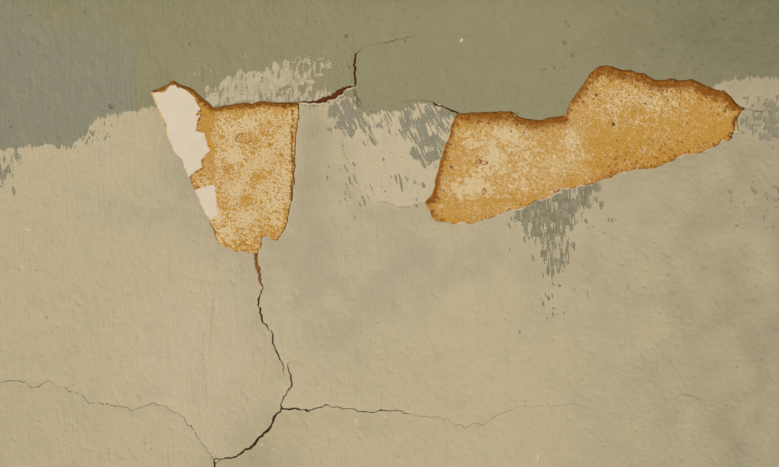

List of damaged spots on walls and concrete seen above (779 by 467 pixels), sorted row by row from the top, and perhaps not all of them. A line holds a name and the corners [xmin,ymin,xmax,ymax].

crack [298,28,424,105]
crack [402,99,458,113]
peeling [151,54,779,320]
crack [0,253,716,467]